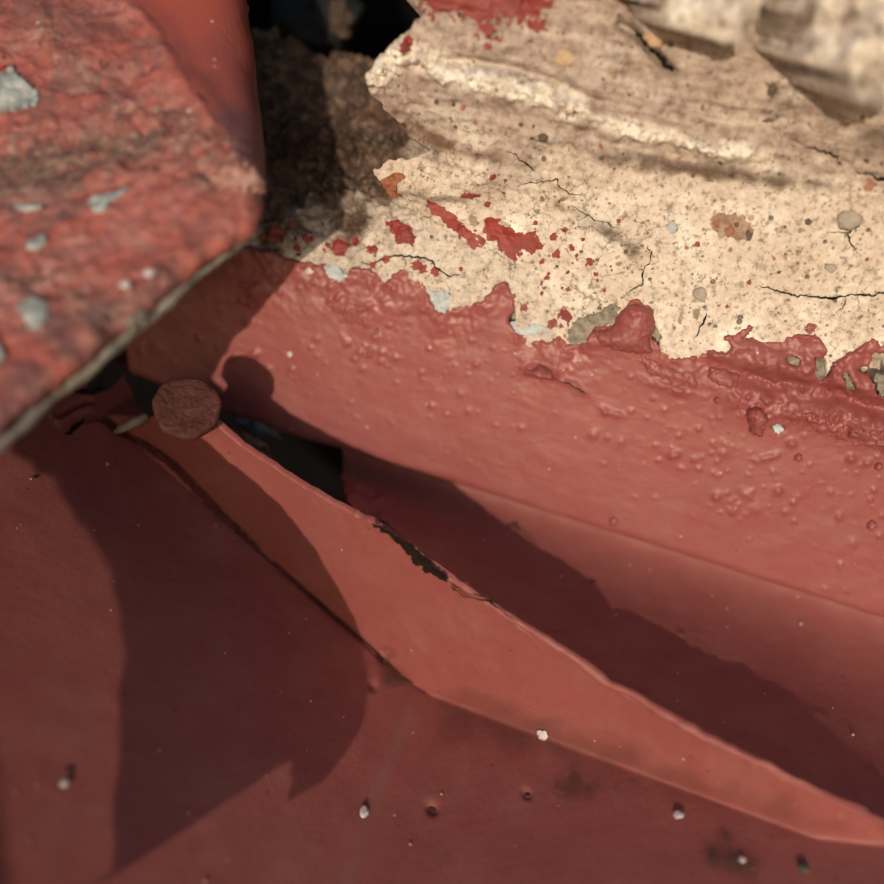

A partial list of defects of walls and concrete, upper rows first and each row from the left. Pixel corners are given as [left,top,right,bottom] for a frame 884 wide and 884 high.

peeling [418,0,560,50]
peeling [0,65,41,114]
crack [803,147,884,181]
crack [508,151,617,228]
peeling [385,219,416,247]
crack [360,254,462,277]
peeling [427,193,606,296]
crack [629,246,652,292]
spalling [711,212,755,241]
crack [759,285,884,314]
spalling [511,302,621,346]
crack [372,523,517,621]